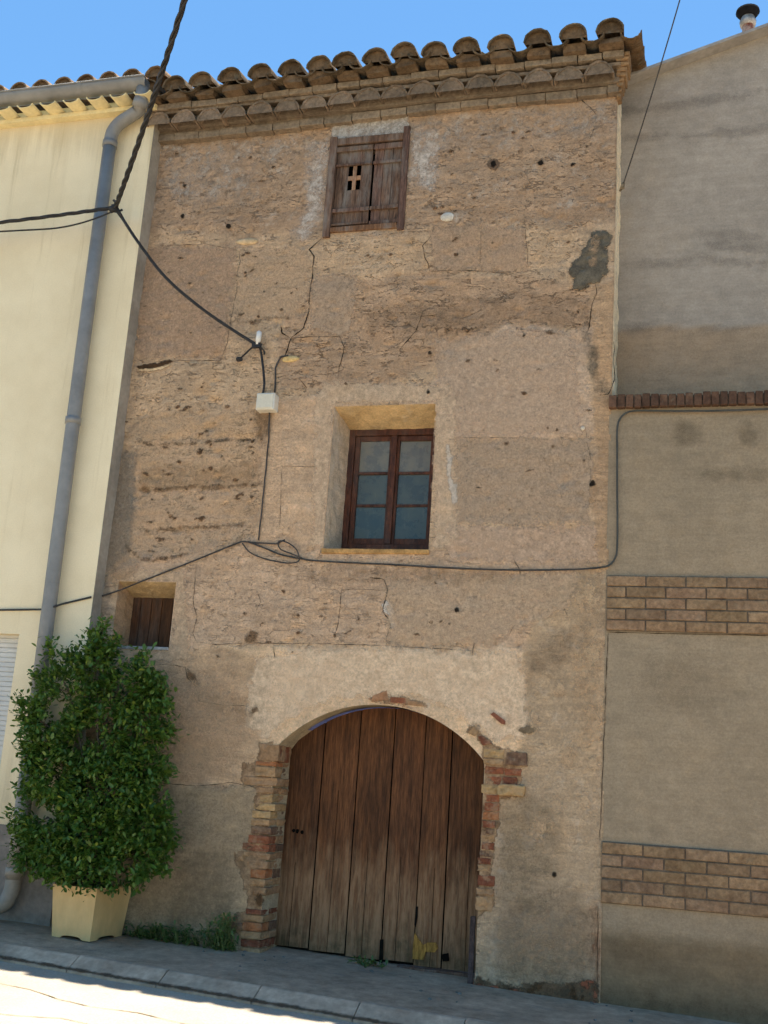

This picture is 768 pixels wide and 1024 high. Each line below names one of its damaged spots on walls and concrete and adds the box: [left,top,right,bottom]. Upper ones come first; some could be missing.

crack [281,239,356,390]
peeling [221,572,578,953]